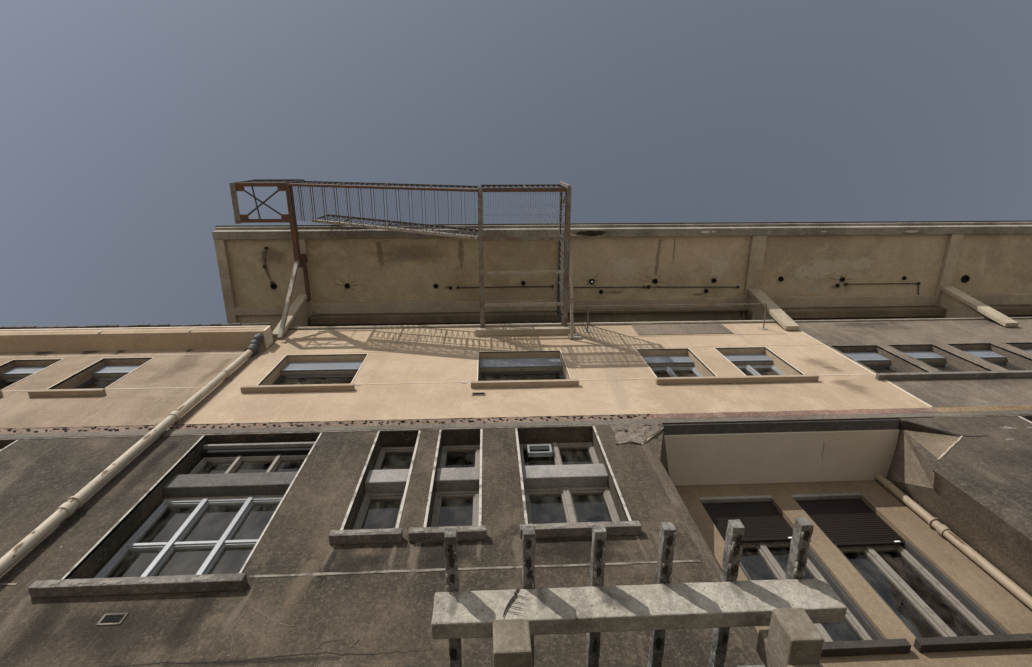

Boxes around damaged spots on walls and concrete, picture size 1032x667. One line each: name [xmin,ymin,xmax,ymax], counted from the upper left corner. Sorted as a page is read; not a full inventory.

crack [502,587,528,617]